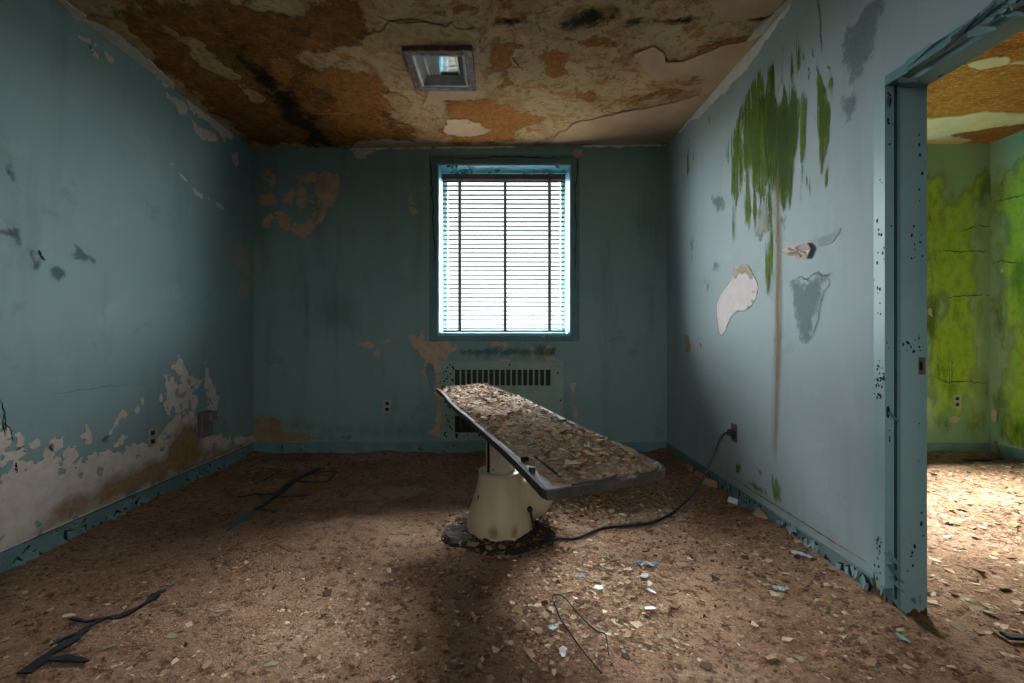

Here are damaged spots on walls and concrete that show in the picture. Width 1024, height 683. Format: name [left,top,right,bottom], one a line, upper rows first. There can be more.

peeling [58,0,239,166]
peeling [160,25,266,104]
water stain [226,33,332,148]
peeling [358,18,481,74]
peeling [551,0,793,158]
peeling [945,0,1024,70]
peeling [351,118,515,159]
peeling [918,111,1024,159]
water stain [726,40,800,443]
peeling [716,264,758,336]
peeling [791,276,822,341]
peeling [0,355,321,567]